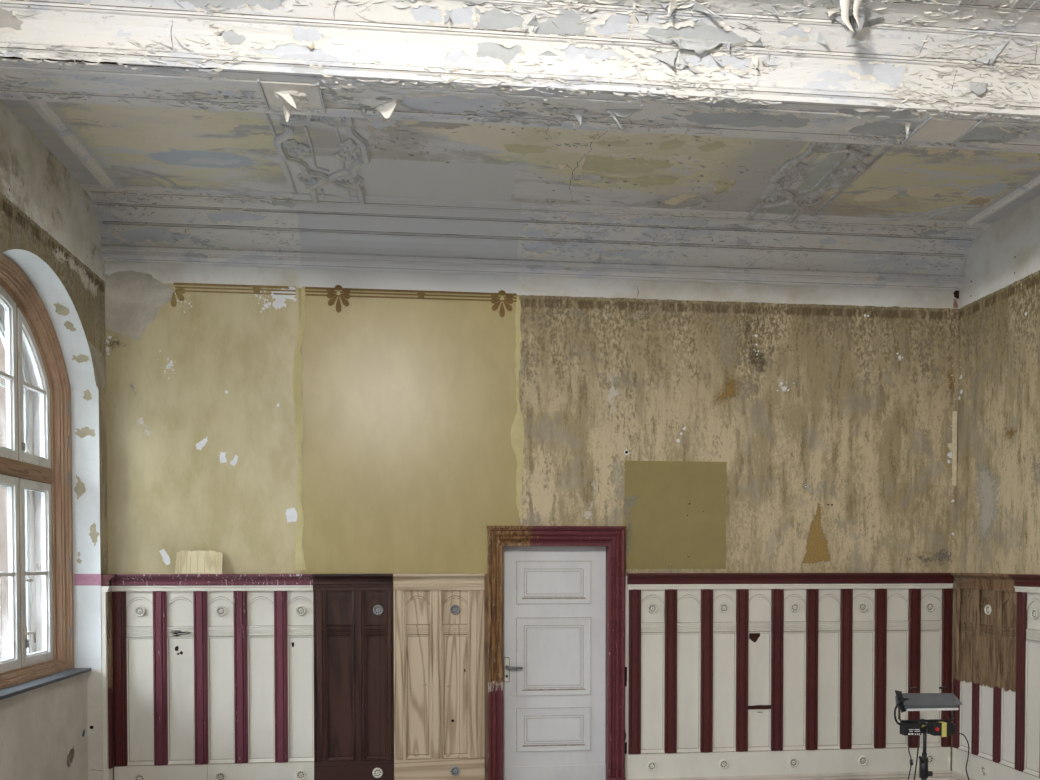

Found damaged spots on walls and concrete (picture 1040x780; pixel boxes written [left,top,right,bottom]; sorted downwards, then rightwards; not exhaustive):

peeling [53,302,76,331]
peeling [72,334,112,401]
peeling [75,426,96,438]
leakage [803,504,830,564]